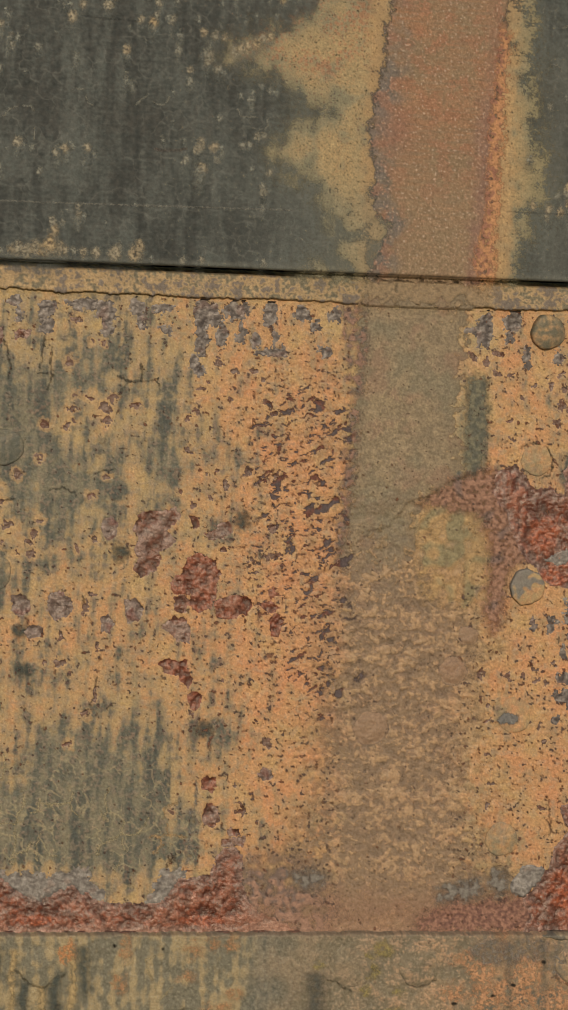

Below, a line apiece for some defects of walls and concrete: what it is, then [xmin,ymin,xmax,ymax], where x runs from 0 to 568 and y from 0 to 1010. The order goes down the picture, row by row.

peeling [198,0,394,286]
rust [366,0,513,292]
damp [113,546,129,559]
peeling [0,294,374,928]
rust [0,294,568,933]
damp [8,947,87,1010]
rust [444,950,568,1010]